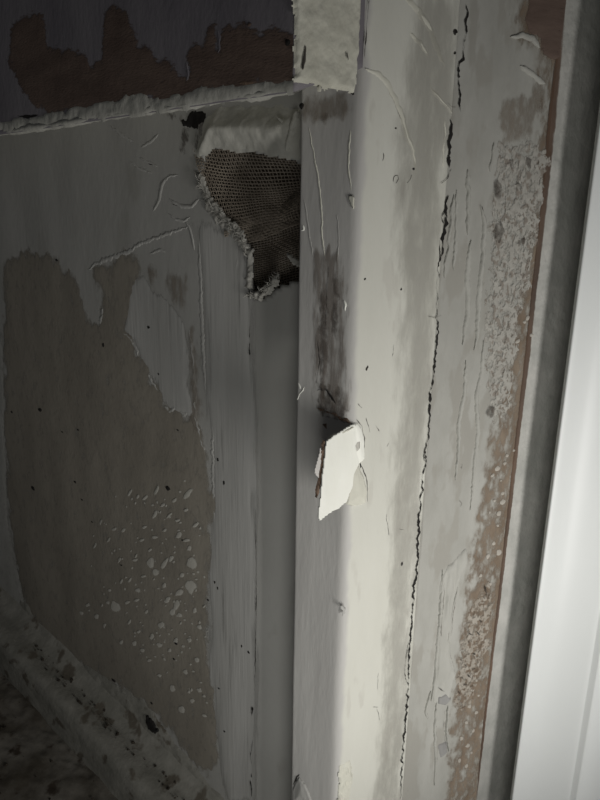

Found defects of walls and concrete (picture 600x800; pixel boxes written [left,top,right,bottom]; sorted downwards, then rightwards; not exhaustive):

peeling [8,5,306,113]
spalling [193,146,305,301]
peeling [3,250,219,770]
water stain [314,248,348,422]
peeling [314,419,379,520]
crack [400,5,469,789]